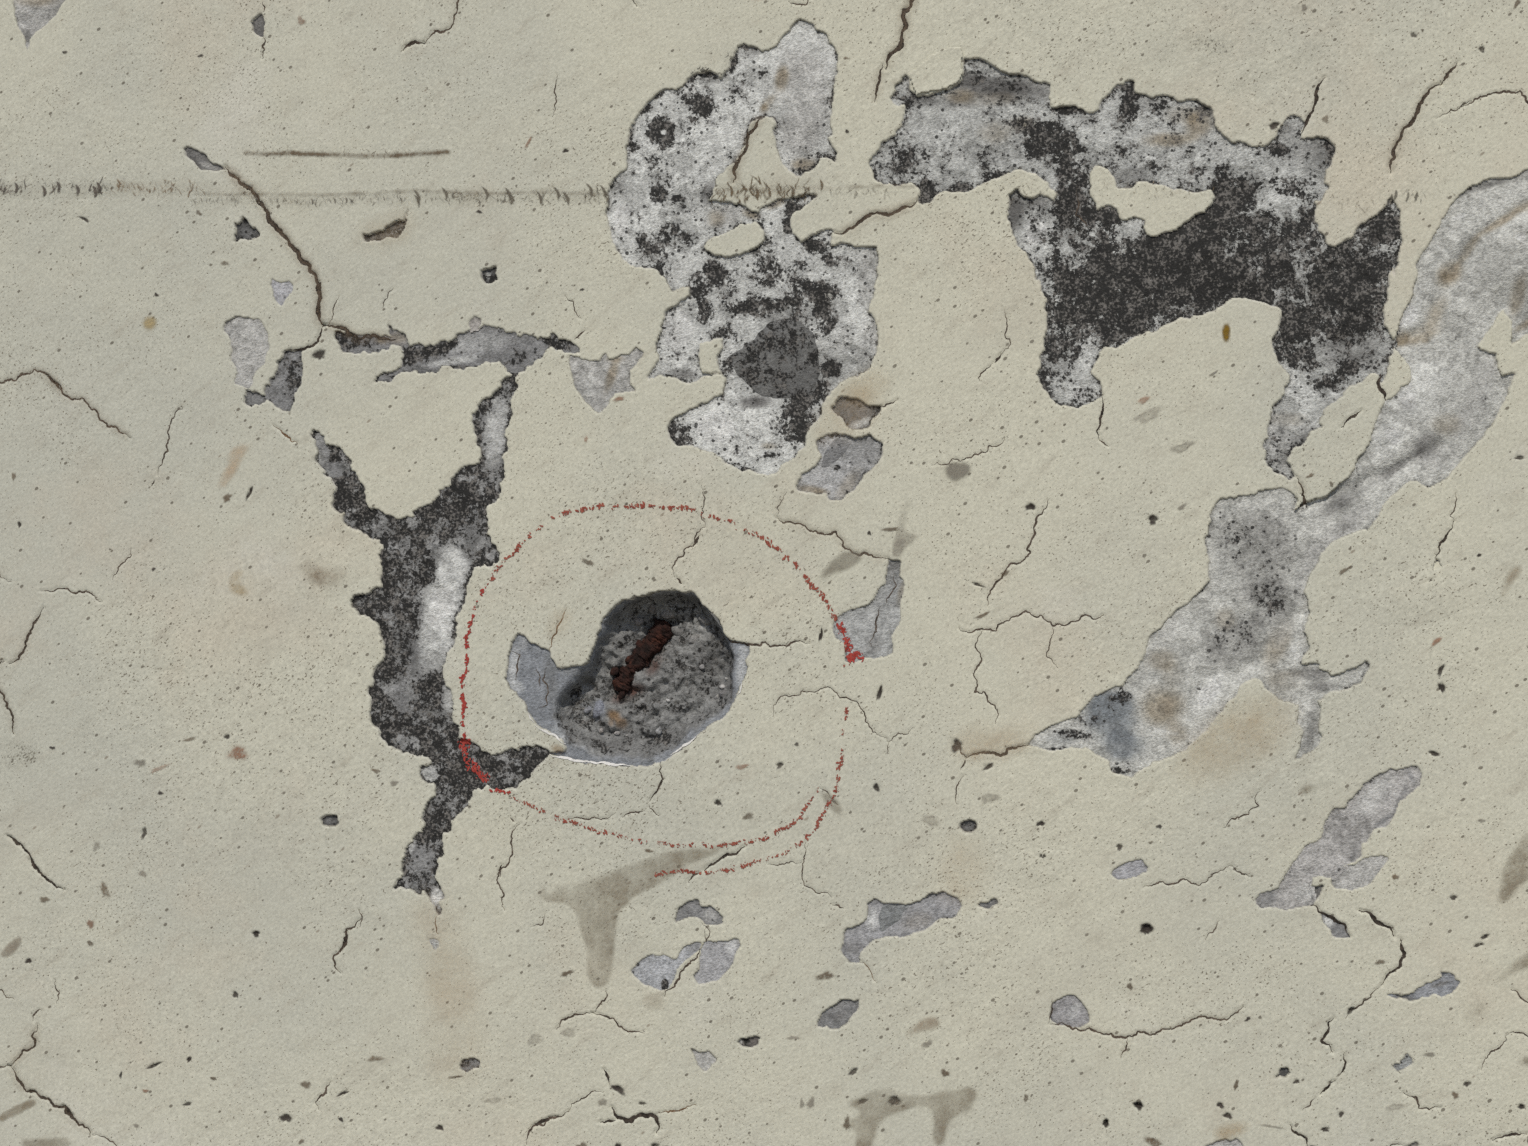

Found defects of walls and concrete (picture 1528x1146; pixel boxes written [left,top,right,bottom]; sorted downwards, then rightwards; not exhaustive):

crack [226,168,396,351]
crack [0,369,183,485]
peeling [224,20,883,915]
peeling [869,47,1528,777]
crack [0,549,132,734]
crack [955,501,1103,804]
crack [7,835,63,889]
peeling [631,899,741,990]
peeling [842,892,998,963]
crack [1049,1002,1242,1055]
peeling [1256,766,1422,938]
crack [1290,905,1406,1146]